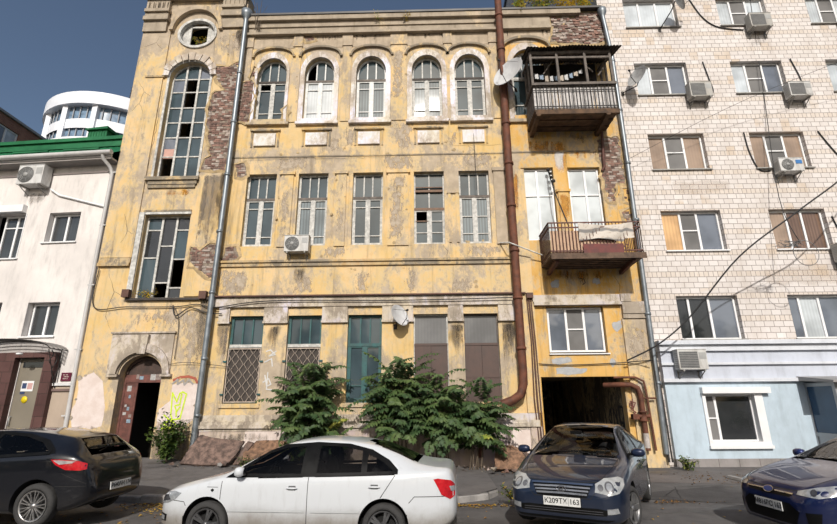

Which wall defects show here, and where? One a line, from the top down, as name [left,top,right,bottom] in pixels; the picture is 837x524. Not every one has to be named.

flaking render [548,11,606,46]
flaking render [198,33,260,181]
flaking render [594,134,633,221]
flaking render [186,239,253,296]
flaking render [69,372,105,429]